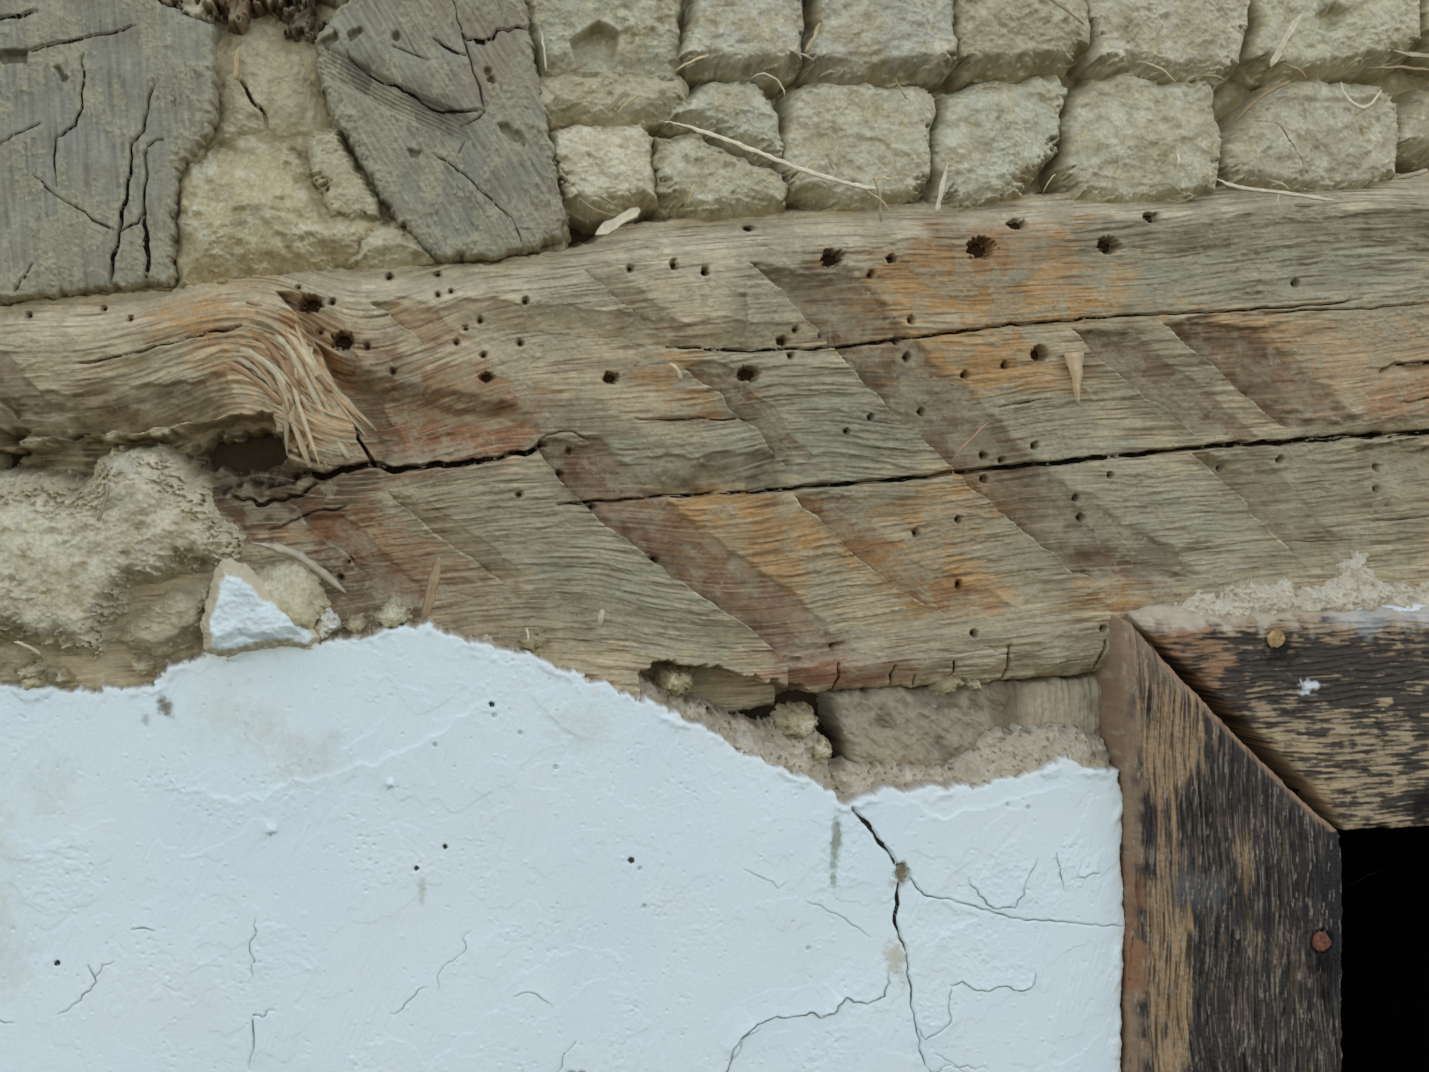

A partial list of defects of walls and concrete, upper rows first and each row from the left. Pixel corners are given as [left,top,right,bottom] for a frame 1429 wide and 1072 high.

flaking render [200,557,331,661]
spalling [638,672,1110,797]
crack [727,807,1120,1072]